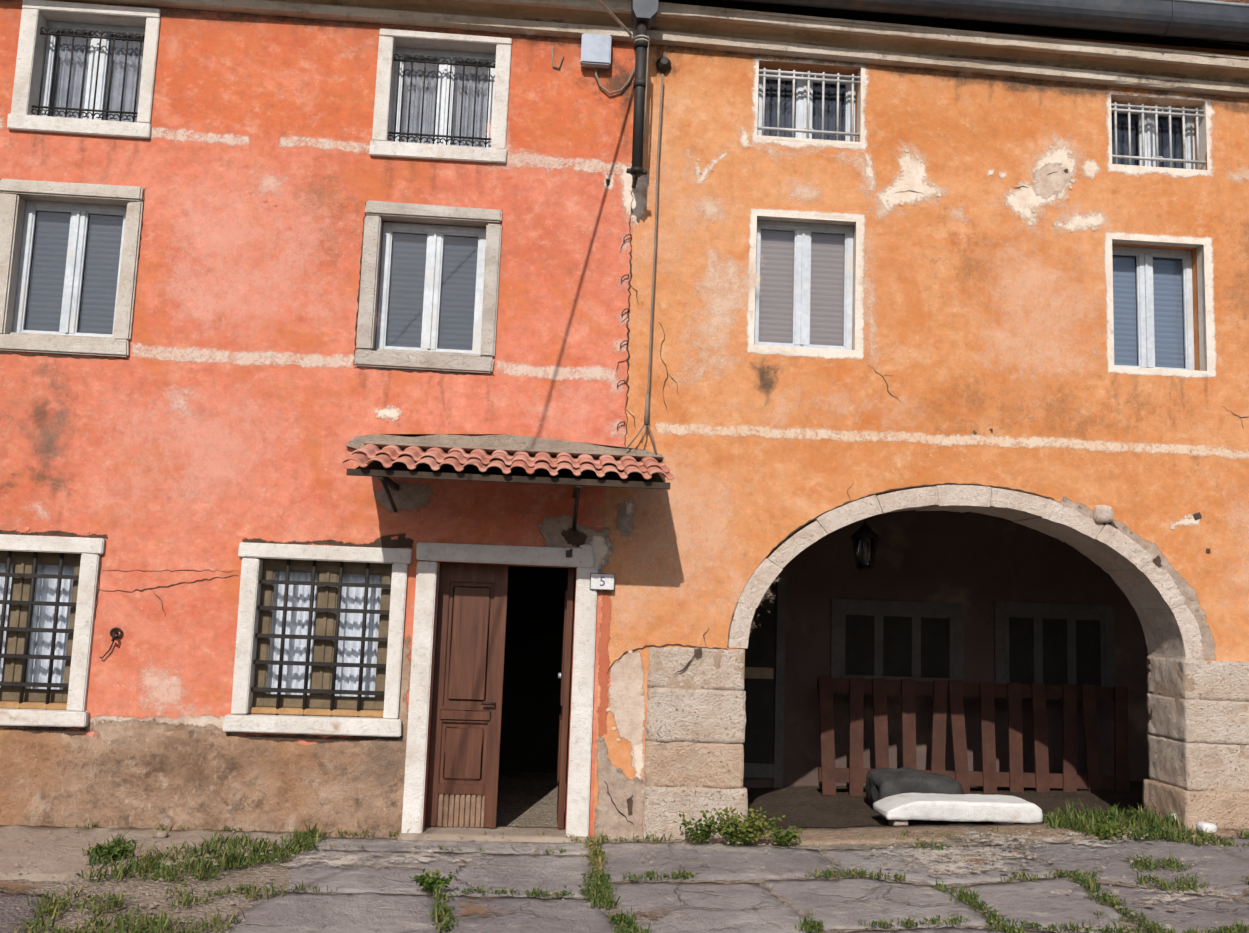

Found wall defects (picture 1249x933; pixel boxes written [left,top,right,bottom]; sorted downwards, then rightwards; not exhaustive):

peeling [740,128,781,154]
peeling [838,147,947,218]
peeling [987,137,1102,229]
peeling [1053,211,1104,232]
leakage [754,366,776,390]
spalling [537,500,636,573]
crack [95,554,238,618]
crack [0,723,77,731]
flaking render [4,636,411,743]
spalling [594,590,646,840]